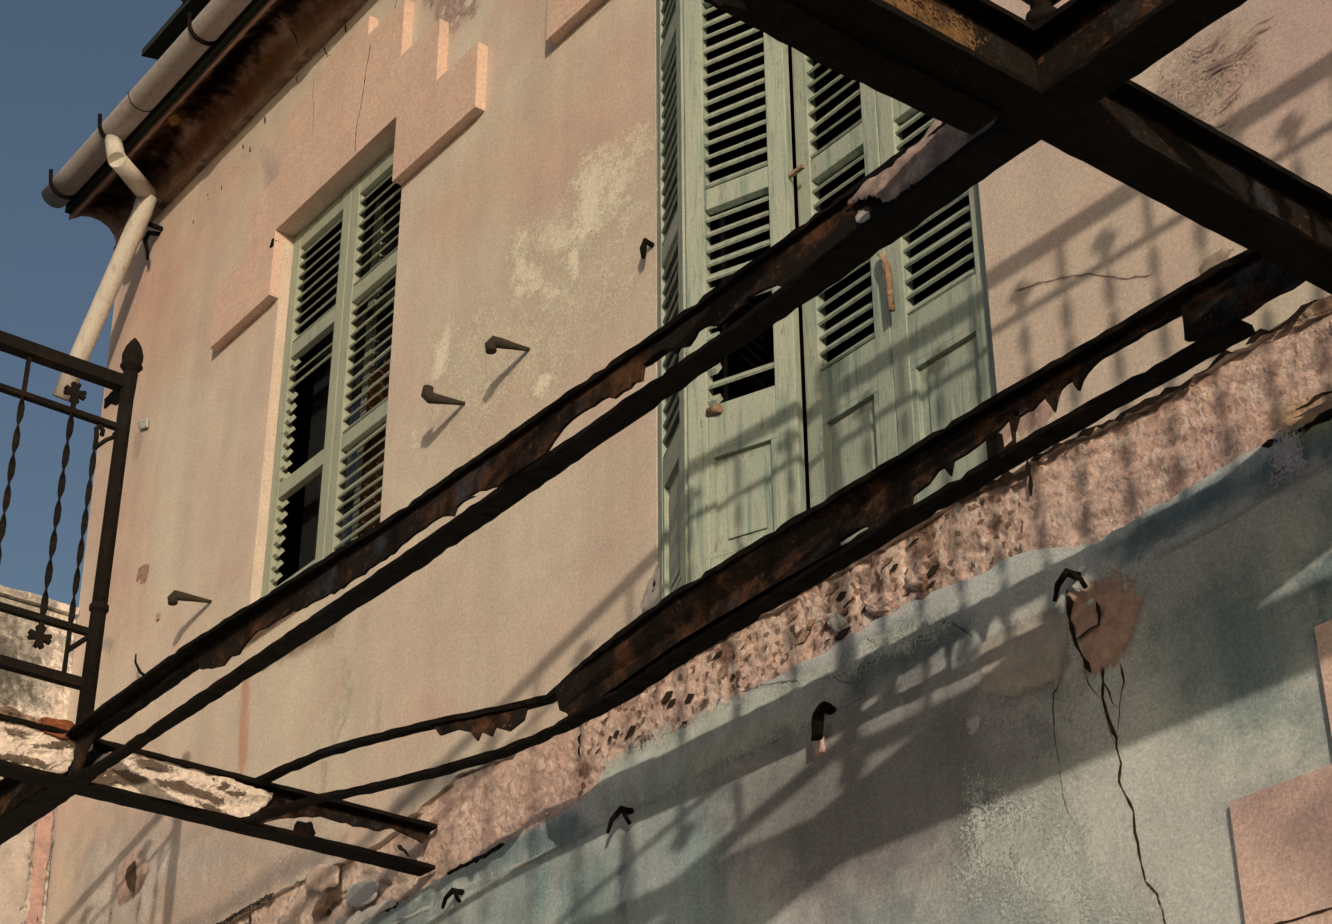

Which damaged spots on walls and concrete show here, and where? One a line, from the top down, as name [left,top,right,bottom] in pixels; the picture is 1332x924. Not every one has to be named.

water stain [131,0,286,169]
corrosion [883,0,989,51]
water stain [81,174,124,214]
crack [1016,273,1152,291]
efflorescence [1266,420,1315,491]
spalling [136,564,149,584]
spalling [230,296,1332,924]
water stain [422,606,962,924]
water stain [911,714,1177,924]
crack [1052,663,1166,924]